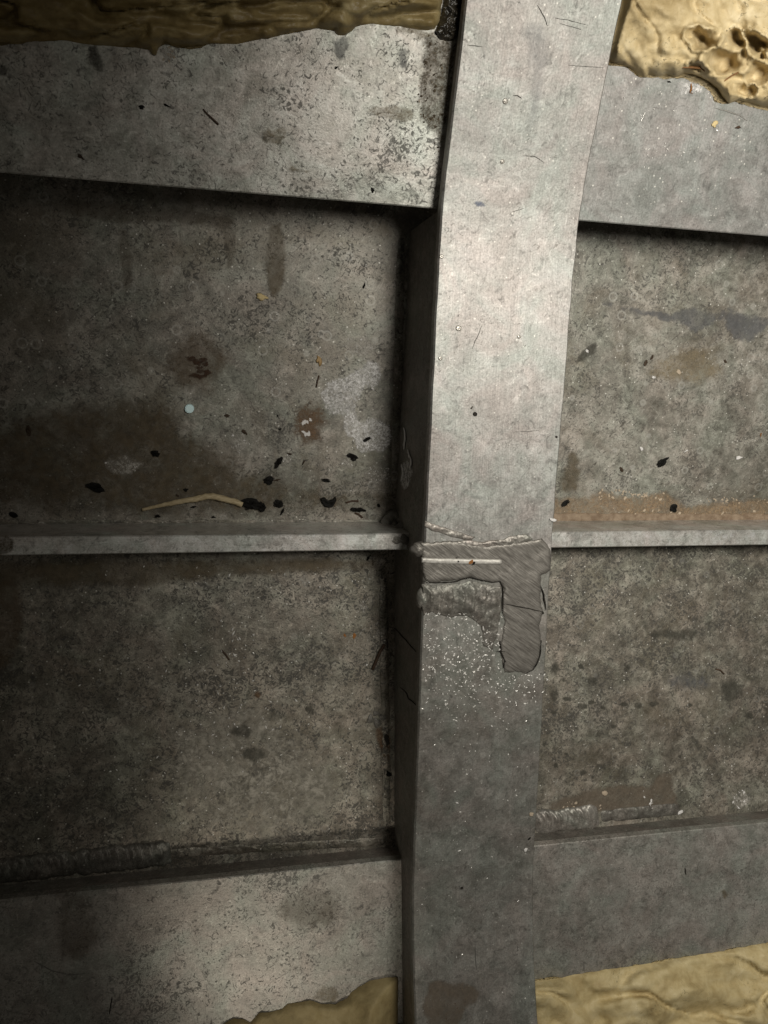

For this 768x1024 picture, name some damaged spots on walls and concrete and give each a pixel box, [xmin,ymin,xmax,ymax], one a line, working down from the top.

rust [174,339,223,381]
water stain [0,408,287,511]
rust [295,361,413,489]